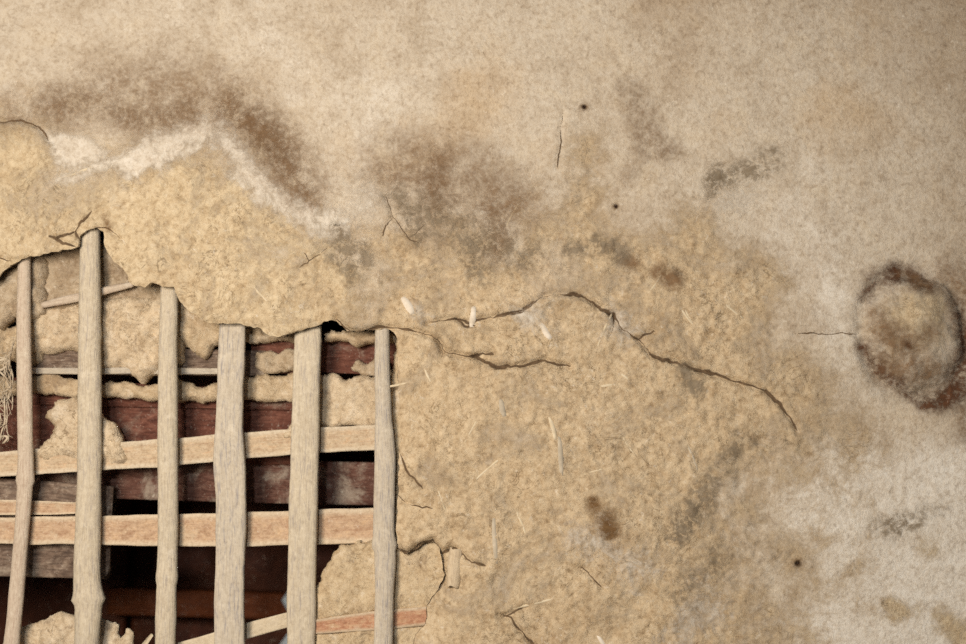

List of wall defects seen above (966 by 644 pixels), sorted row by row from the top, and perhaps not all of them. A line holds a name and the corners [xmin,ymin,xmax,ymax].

water stain [329,224,372,284]
water stain [385,163,538,276]
water stain [562,235,637,266]
flaking render [0,111,871,644]
crack [336,292,797,430]